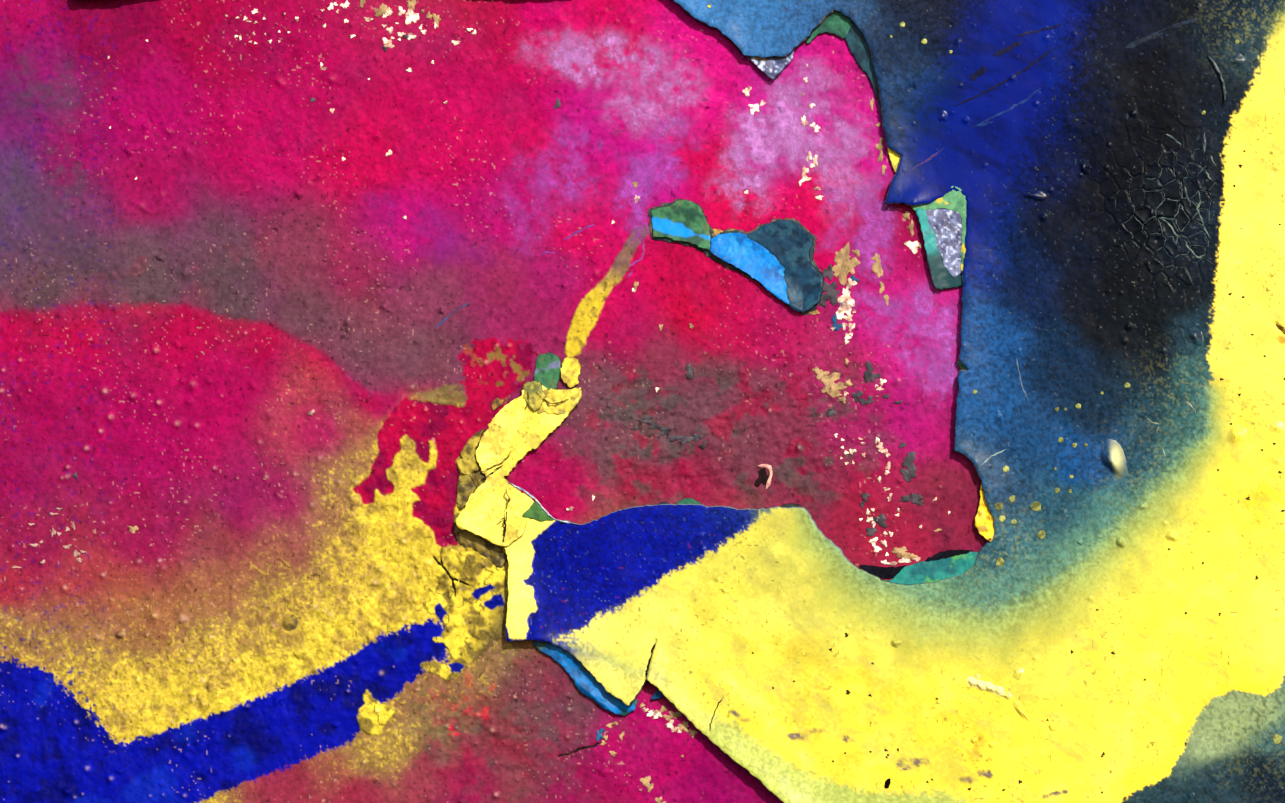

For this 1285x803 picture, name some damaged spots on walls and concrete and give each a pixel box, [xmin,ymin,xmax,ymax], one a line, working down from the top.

peeling [225,9,299,44]
peeling [320,0,441,52]
crack [1115,147,1217,283]
peeling [454,0,1285,803]
peeling [29,508,87,564]